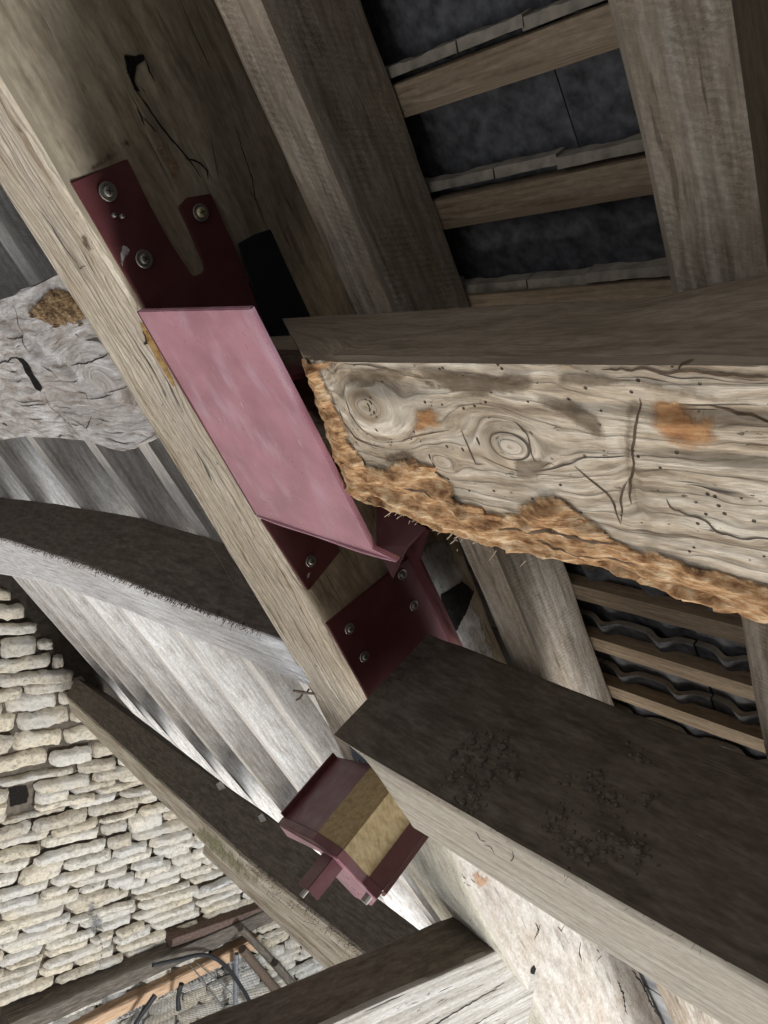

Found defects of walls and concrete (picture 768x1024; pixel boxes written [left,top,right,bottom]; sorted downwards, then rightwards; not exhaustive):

crack [133,59,219,178]
crack [0,308,150,437]
crack [498,399,642,565]
crack [666,499,742,539]